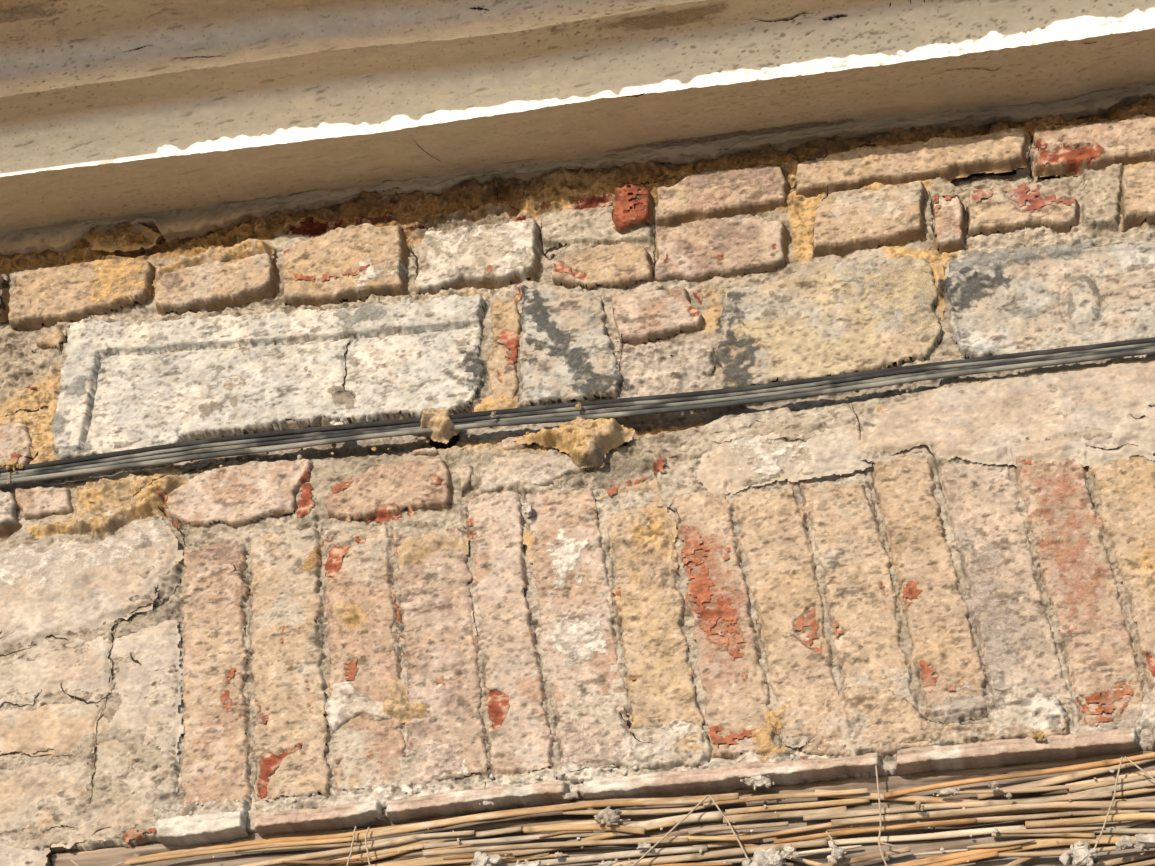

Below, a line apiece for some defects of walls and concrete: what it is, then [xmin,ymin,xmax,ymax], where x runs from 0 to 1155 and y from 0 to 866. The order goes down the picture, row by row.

spalling [933,138,1104,218]
spalling [284,211,436,254]
crack [339,340,355,398]
crack [851,403,937,464]
crack [1087,405,1155,462]
spalling [296,468,316,518]
spalling [325,503,417,579]
spalling [681,526,746,661]
crack [0,578,181,835]
spalling [484,689,510,731]
spalling [1077,677,1133,725]
spalling [256,743,303,799]